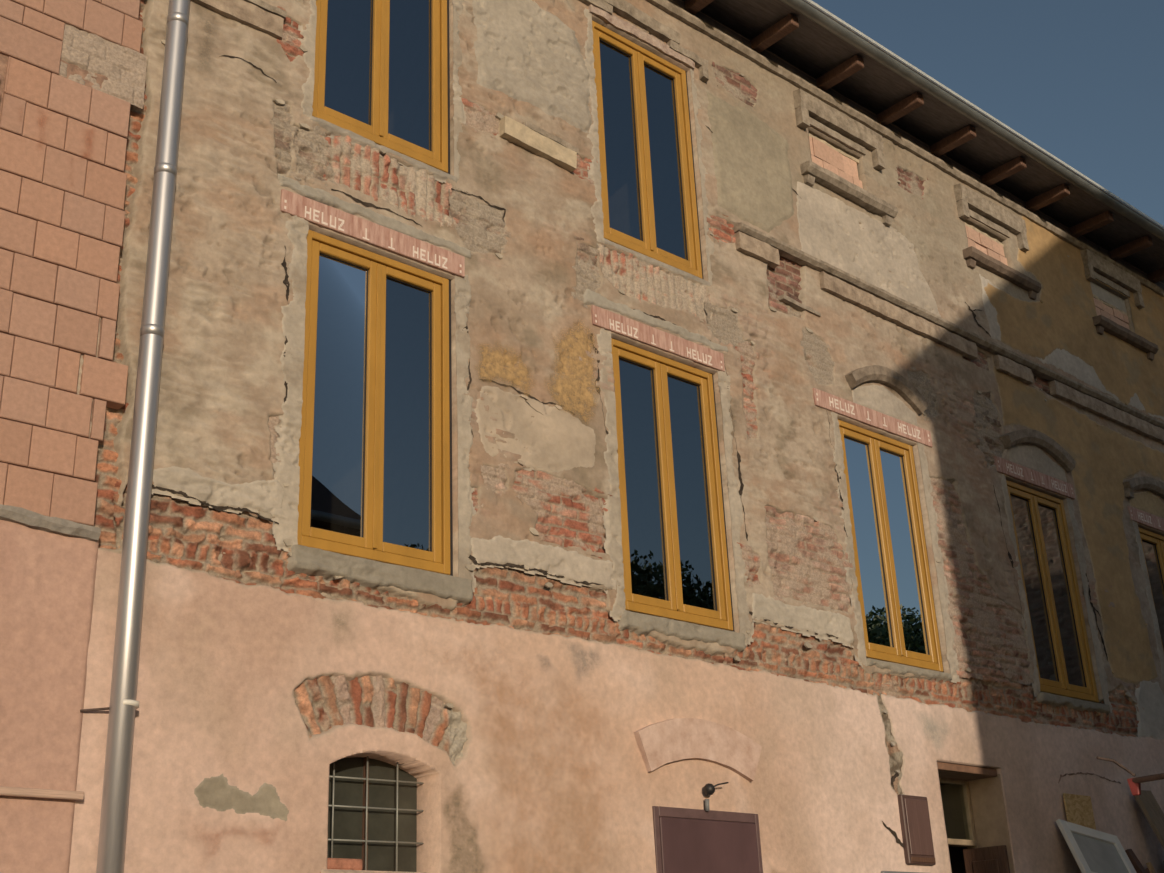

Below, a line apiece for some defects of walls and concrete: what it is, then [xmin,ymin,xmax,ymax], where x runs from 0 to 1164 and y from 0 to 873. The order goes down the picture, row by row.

crack [219,55,277,83]
flaking render [276,6,308,62]
flaking render [270,99,461,227]
crack [281,336,289,403]
crack [281,245,290,301]
peeling [984,216,1164,417]
peeling [472,326,613,559]
crack [708,339,748,541]
spalling [146,471,1139,737]
crack [873,687,904,795]
peeling [194,774,289,822]
crack [882,821,904,848]